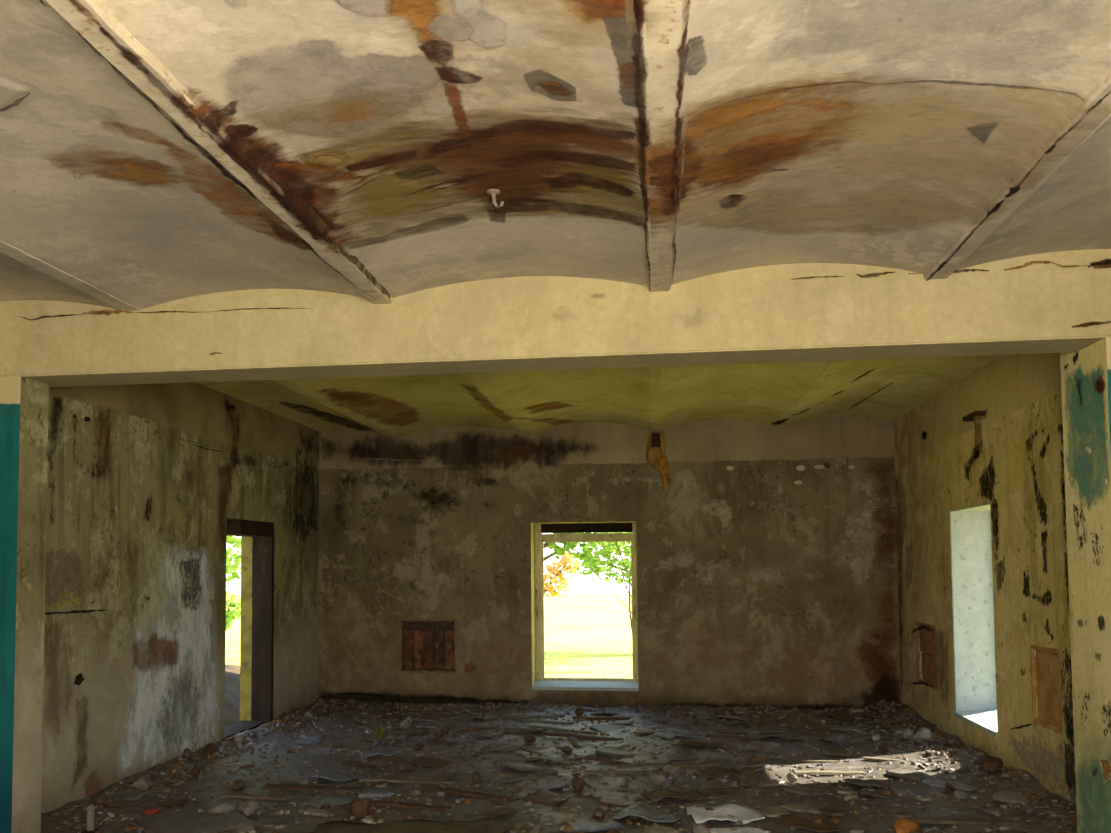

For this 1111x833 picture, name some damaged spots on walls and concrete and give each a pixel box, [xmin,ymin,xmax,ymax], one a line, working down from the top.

rust [70,0,159,82]
crack [18,308,313,320]
rust [66,90,391,300]
rust [389,0,481,141]
peeling [524,70,576,101]
rust [567,0,704,290]
crack [1072,320,1111,328]
spalling [1089,258,1111,270]
damp [349,434,589,524]
mould [964,450,1006,592]
damp [1023,424,1105,640]
damp [1061,653,1111,798]